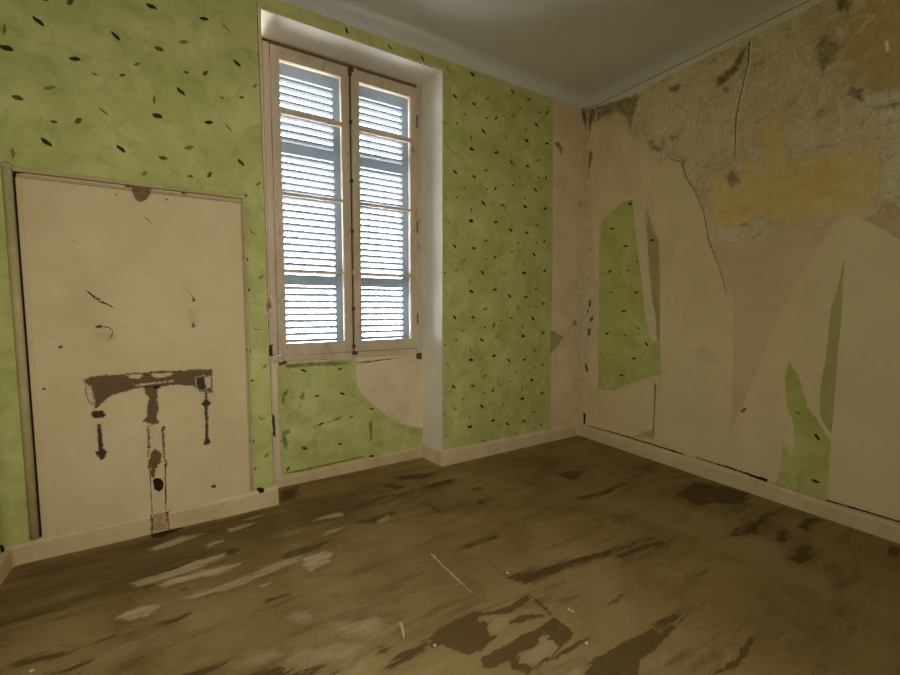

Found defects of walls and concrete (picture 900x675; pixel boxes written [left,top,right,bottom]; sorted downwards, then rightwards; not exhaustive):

leakage [581,91,642,135]
crack [734,41,752,161]
peeling [131,186,151,202]
flaking render [582,119,661,439]
crack [669,158,727,295]
spalling [195,375,206,392]